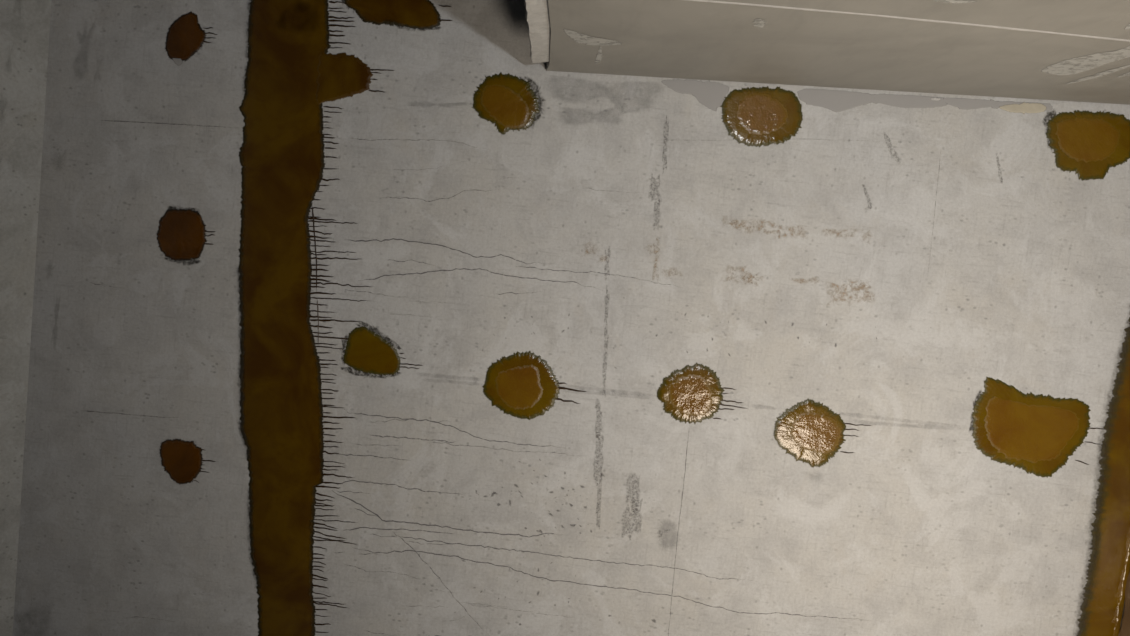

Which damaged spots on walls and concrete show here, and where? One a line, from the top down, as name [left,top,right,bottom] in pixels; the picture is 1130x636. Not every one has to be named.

crack [351,238,633,295]
crack [333,413,847,624]